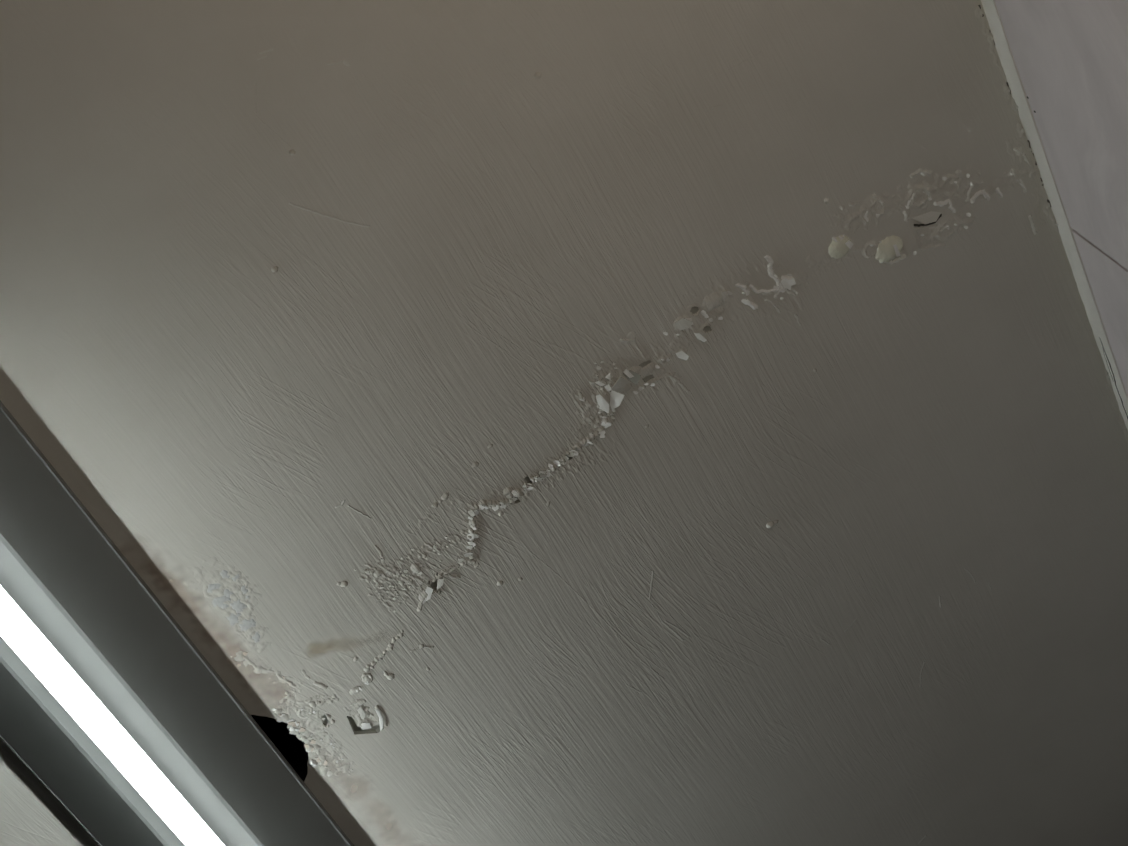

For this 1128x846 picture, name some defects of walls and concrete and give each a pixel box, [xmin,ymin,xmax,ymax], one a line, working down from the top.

crack [425,412,617,571]
water stain [182,556,276,655]
peeling [355,493,468,612]
flaking render [272,688,388,779]